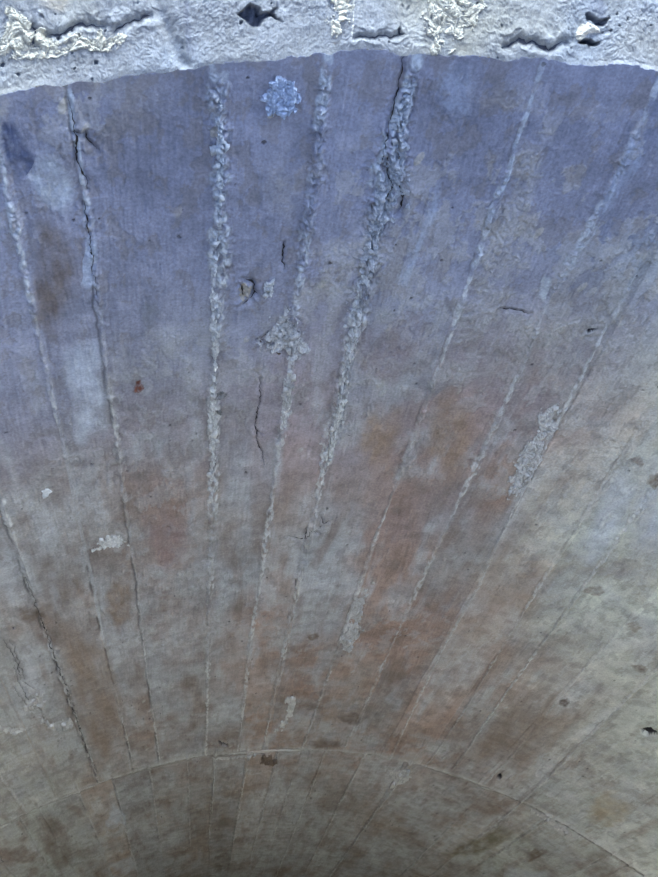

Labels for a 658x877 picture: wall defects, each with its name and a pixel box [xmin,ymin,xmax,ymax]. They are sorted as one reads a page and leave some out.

spalling [256,75,302,120]
crack [68,100,97,294]
corrosion [133,379,145,393]
crack [255,379,264,461]
spalling [273,693,296,732]